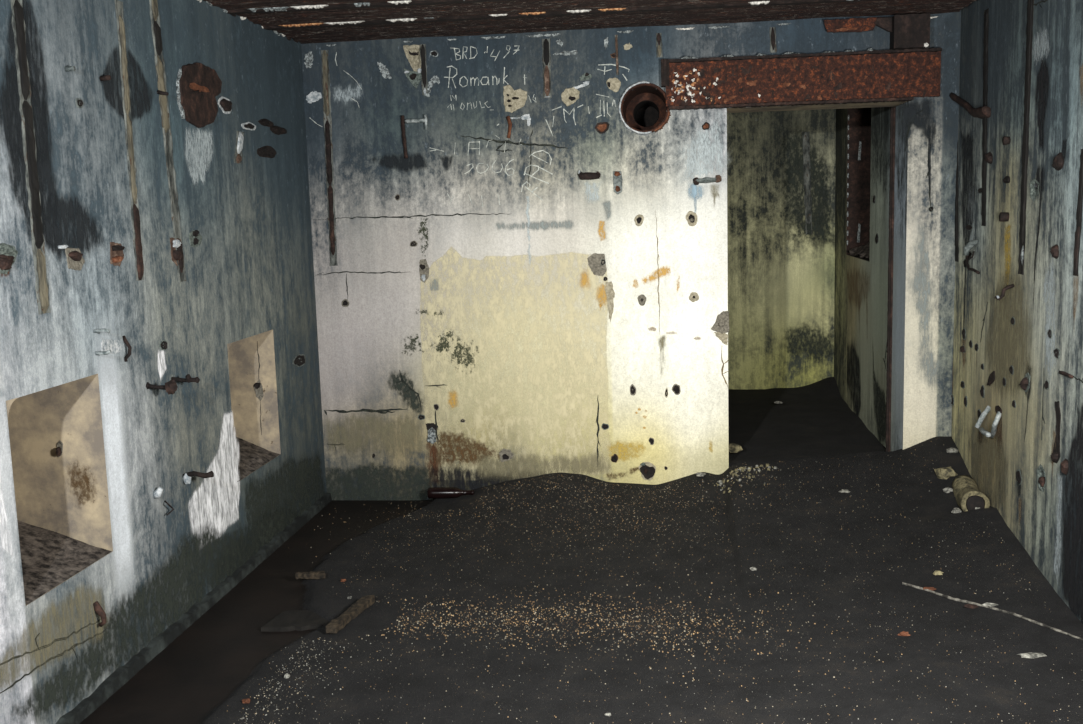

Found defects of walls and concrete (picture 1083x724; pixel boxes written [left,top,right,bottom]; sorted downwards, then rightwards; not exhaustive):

corrosion [681,68,758,106]
damp [687,122,723,210]
damp [782,130,834,243]
spalling [711,311,730,345]
mould [786,326,832,359]
damp [0,197,644,719]